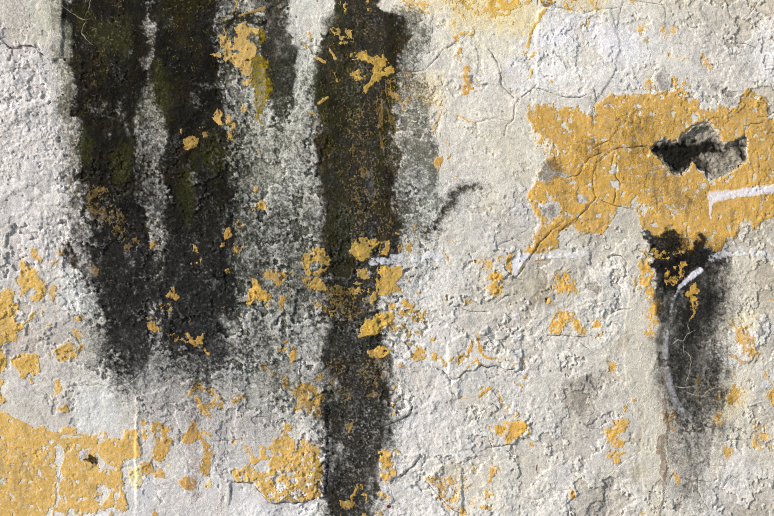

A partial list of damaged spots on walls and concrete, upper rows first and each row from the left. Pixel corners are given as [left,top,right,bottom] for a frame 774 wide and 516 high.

crack [395,33,468,74]
peeling [522,0,598,79]
crack [537,0,666,22]
damp [533,0,670,96]
damp [690,76,741,111]
crack [460,49,652,312]
peeling [524,73,774,261]
damp [2,0,492,516]
peeling [0,248,171,516]
peeling [170,318,210,355]
damp [535,107,750,516]
peeling [231,429,317,503]